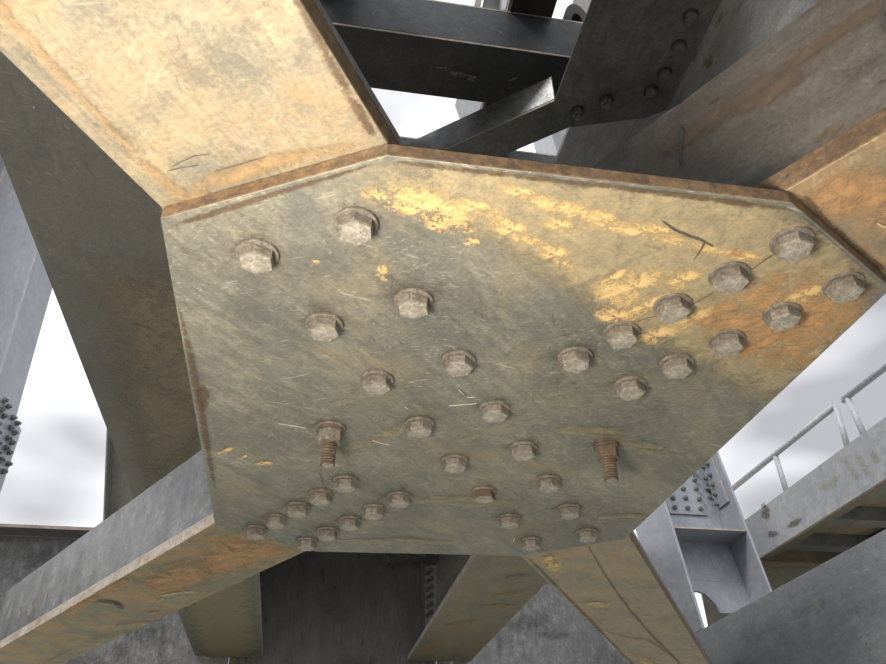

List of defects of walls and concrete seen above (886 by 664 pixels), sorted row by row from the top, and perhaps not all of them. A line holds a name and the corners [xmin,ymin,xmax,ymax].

corrosion [182,166,365,223]
peeling [364,184,577,268]
peeling [499,185,762,262]
crack [662,221,713,259]
corrosion [373,162,886,403]
peeling [594,268,714,345]
peeling [785,285,822,303]
corrosion [67,579,130,614]